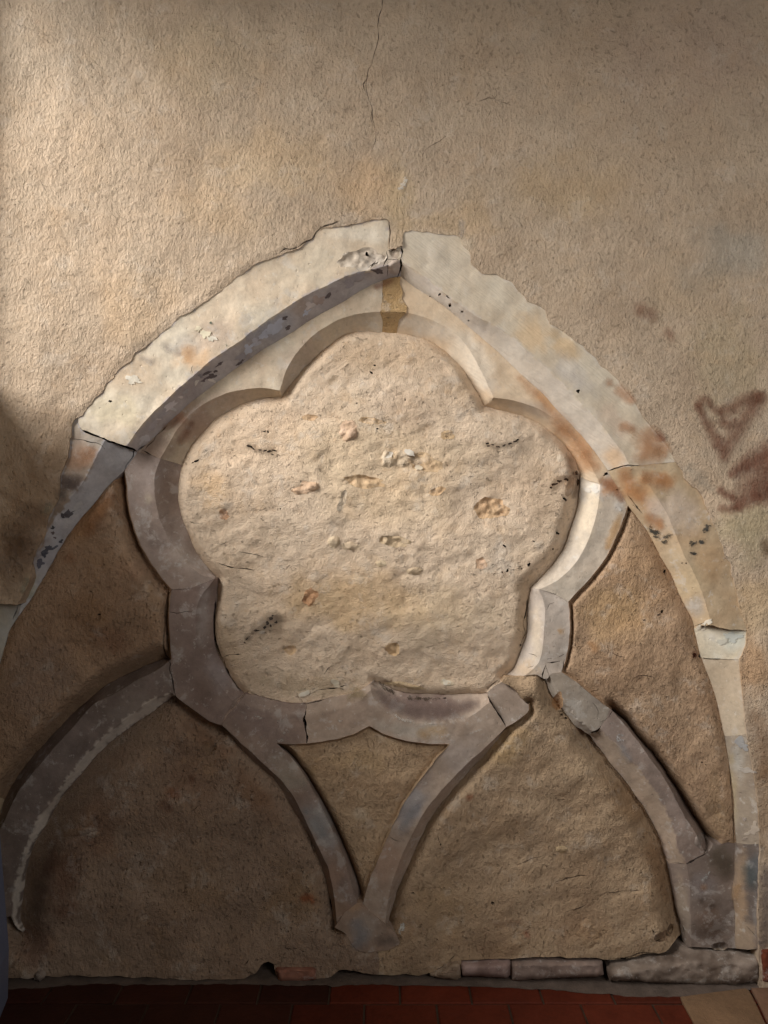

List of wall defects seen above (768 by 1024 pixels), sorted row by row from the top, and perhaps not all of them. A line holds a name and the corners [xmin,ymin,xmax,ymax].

spalling [337,247,399,289]
peeling [140,316,291,445]
crack [76,416,161,463]
flaking render [337,449,443,511]
peeling [550,470,608,494]
flaking render [474,497,510,519]
spalling [379,536,411,548]
spalling [302,588,319,607]
spalling [385,643,399,656]
crack [256,666,345,743]